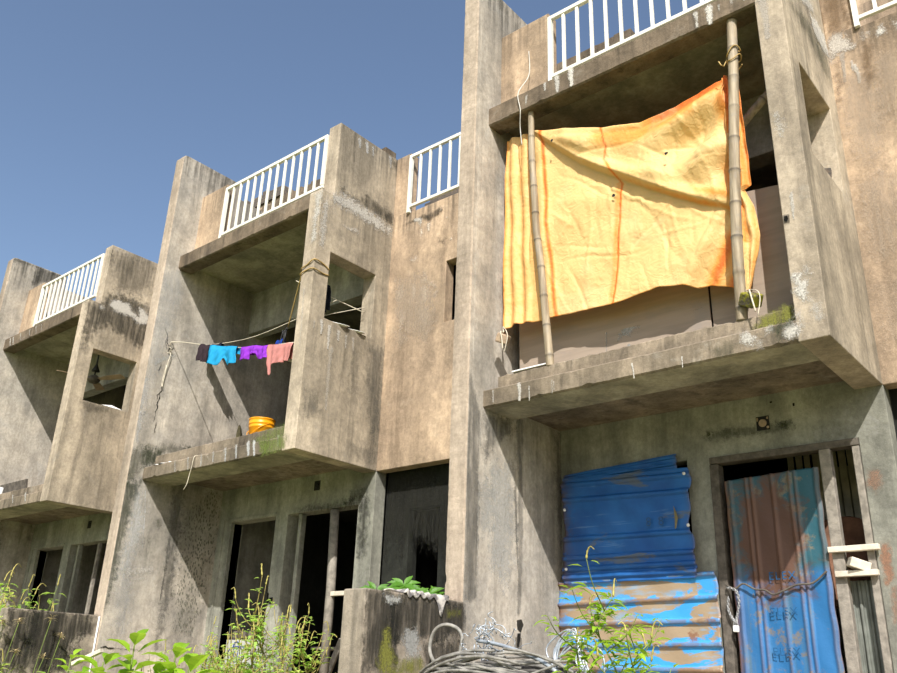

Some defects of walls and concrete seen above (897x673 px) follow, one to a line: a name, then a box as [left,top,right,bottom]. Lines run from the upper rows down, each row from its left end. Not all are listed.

efflorescence [693,4,713,28]
leakage [355,194,392,224]
leakage [82,295,149,346]
crack [153,329,170,433]
leakage [362,590,466,673]